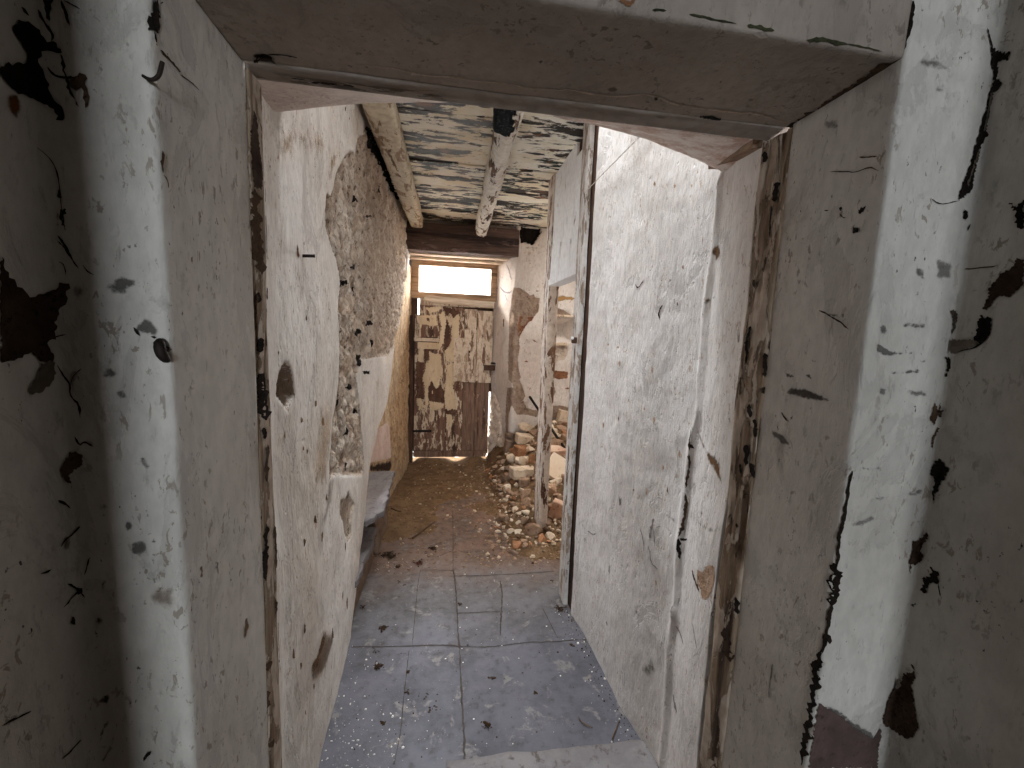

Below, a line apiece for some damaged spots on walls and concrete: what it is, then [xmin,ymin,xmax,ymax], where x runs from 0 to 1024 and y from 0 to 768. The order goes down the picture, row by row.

spalling [0,0,90,121]
flaking render [553,116,752,171]
spalling [0,256,70,395]
spalling [276,351,295,411]
spalling [322,124,460,479]
spalling [486,287,540,456]
spalling [552,346,569,421]
damp [786,374,828,401]
crack [799,471,853,765]
spalling [909,533,941,607]
flaking render [808,664,918,768]